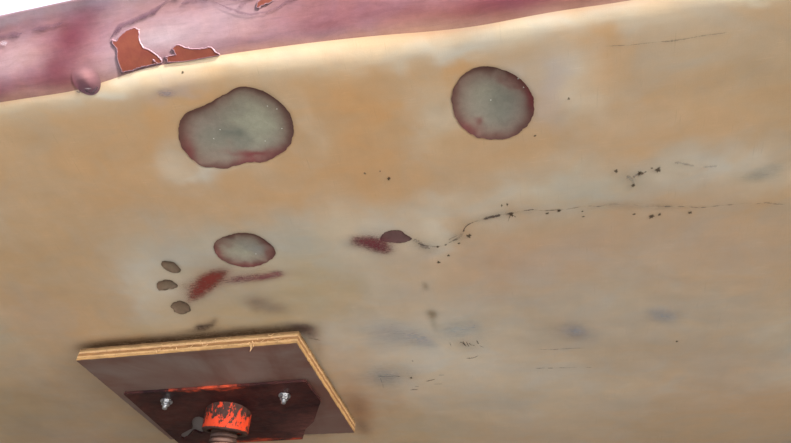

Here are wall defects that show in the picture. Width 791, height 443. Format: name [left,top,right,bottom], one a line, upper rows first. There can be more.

peeling [111,27,220,74]
crack [414,203,599,263]